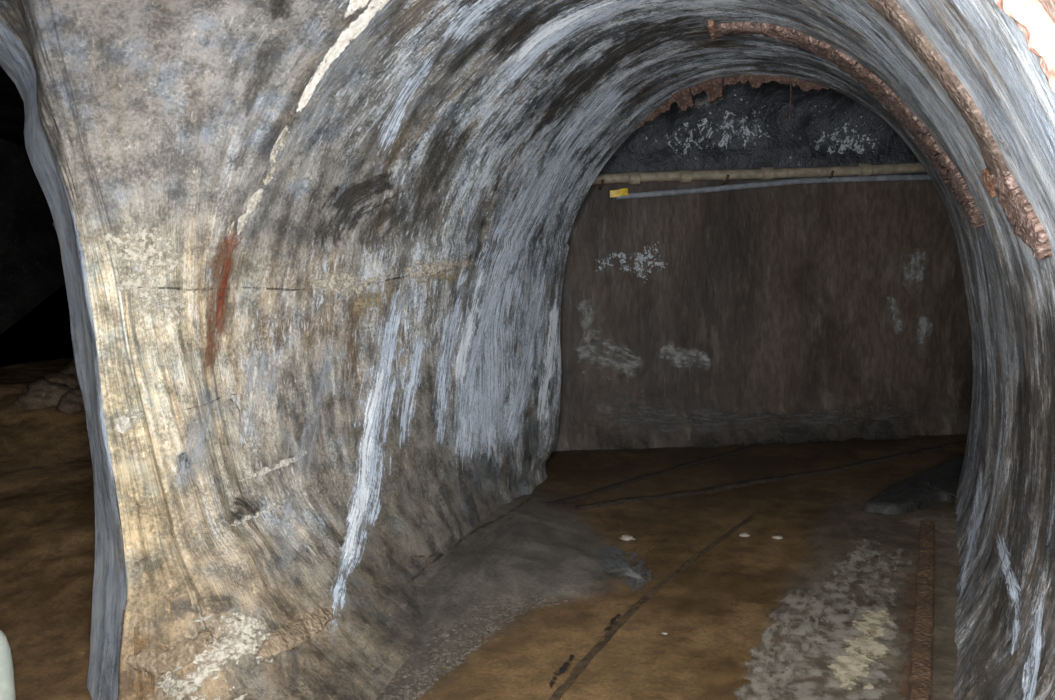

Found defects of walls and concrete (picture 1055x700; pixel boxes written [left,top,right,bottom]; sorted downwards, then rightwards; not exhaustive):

peeling [227,126,293,242]
peeling [293,0,394,116]
corrosion [636,75,829,130]
corrosion [707,21,985,228]
corrosion [205,227,242,373]
damp [314,0,710,630]